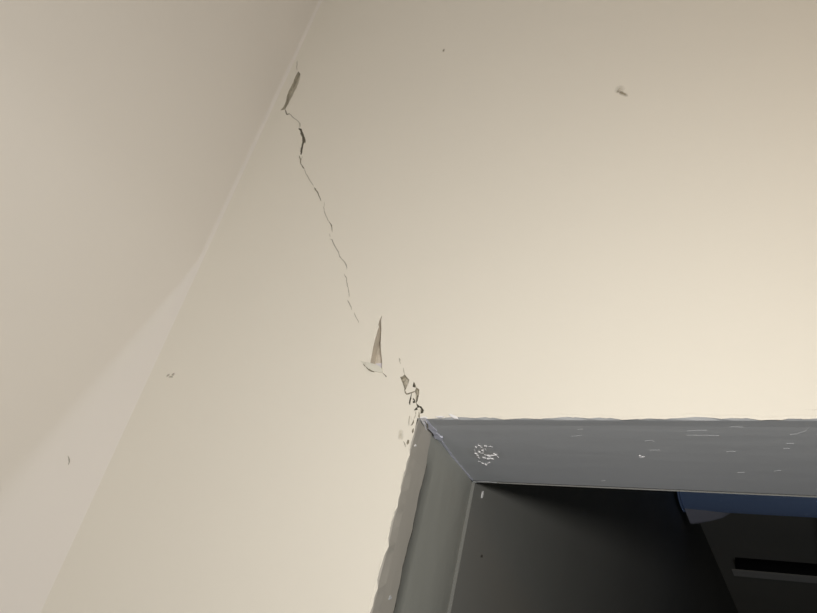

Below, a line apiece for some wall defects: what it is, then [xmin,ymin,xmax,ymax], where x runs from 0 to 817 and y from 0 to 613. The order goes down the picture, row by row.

crack [285,110,359,322]
flaking render [368,368,473,613]